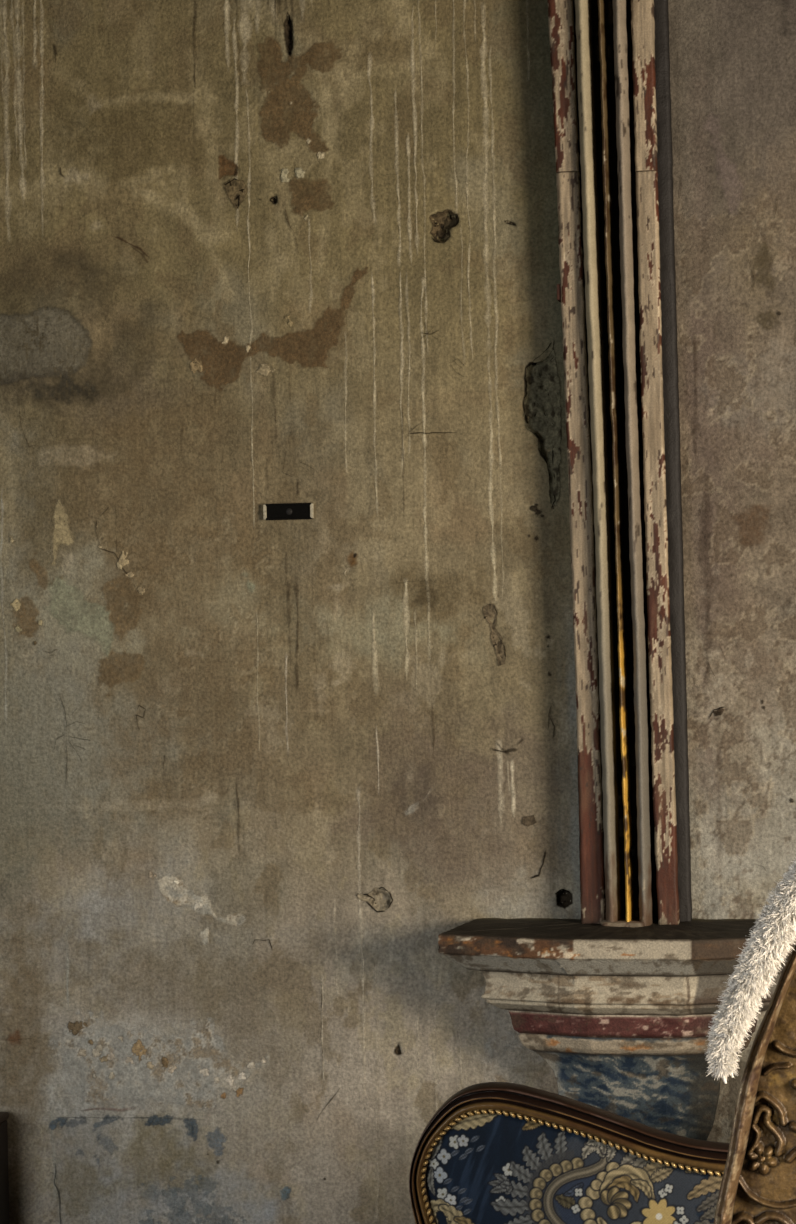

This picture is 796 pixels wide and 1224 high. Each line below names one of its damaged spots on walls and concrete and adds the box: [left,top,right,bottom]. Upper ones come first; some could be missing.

leakage [5,71,25,214]
leakage [2,0,44,154]
leakage [224,0,258,108]
leakage [235,118,250,272]
peeling [257,12,342,159]
leakage [395,30,425,301]
flaking render [429,209,459,243]
leakage [0,272,115,408]
peeling [177,267,368,390]
leakage [400,387,432,684]
leakage [489,407,501,528]
peeling [601,918,644,927]